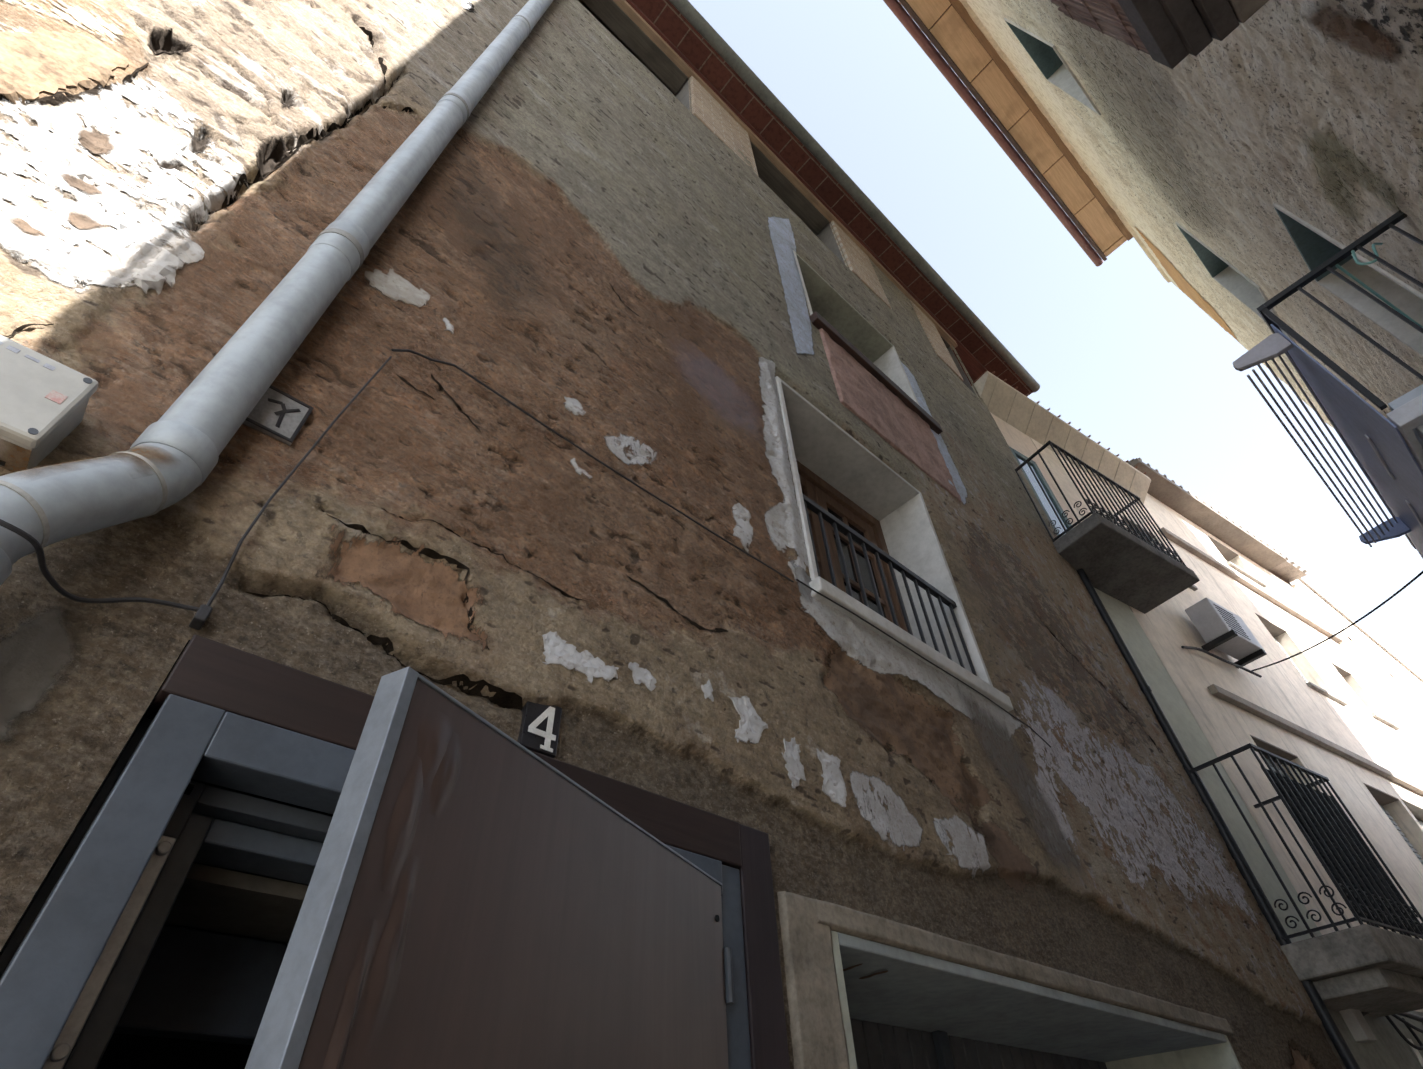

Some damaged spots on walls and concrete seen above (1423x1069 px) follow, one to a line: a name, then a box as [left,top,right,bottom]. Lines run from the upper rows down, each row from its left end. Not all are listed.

crack [0,63,149,106]
peeling [0,76,249,295]
crack [195,27,413,232]
flaking render [365,269,430,308]
spalling [316,524,488,651]
crack [246,505,586,710]
flaking render [542,631,656,691]
crack [623,573,728,633]
flaking render [701,680,768,744]
peeling [732,357,1260,928]